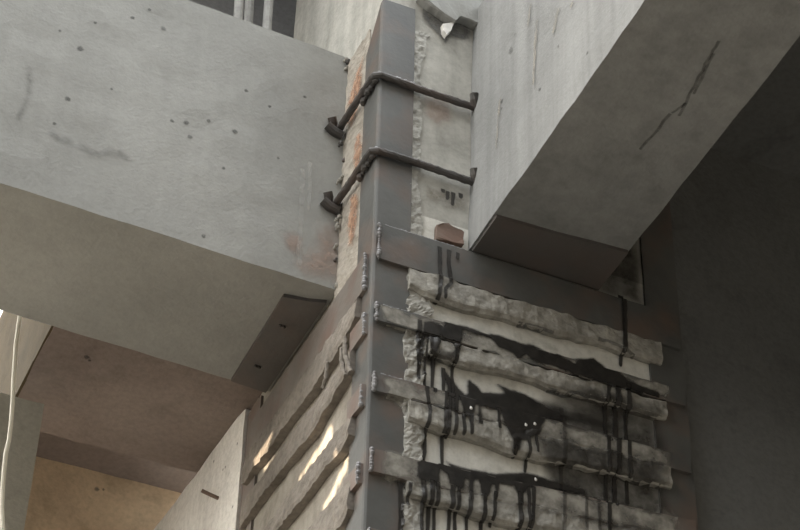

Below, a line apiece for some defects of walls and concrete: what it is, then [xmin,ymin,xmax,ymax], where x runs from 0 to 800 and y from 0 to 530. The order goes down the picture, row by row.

spalling [423,10,470,42]
crack [645,44,717,143]
spalling [333,29,371,298]